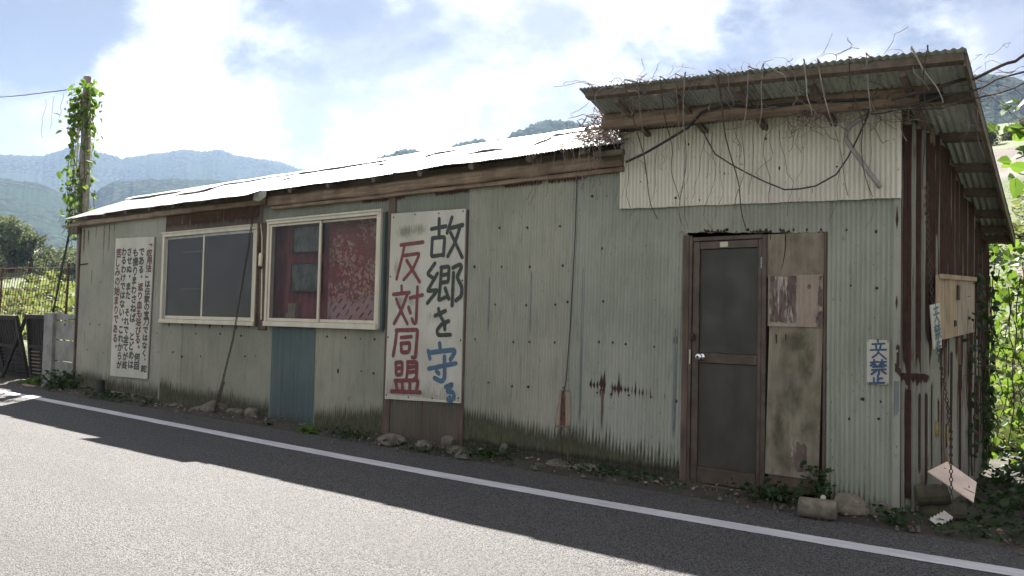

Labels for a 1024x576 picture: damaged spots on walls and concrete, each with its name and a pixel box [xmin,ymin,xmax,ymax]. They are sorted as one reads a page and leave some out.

peeling [769,275,822,344]
rust [895,124,989,499]
rust [589,372,651,425]
damp [463,439,679,480]